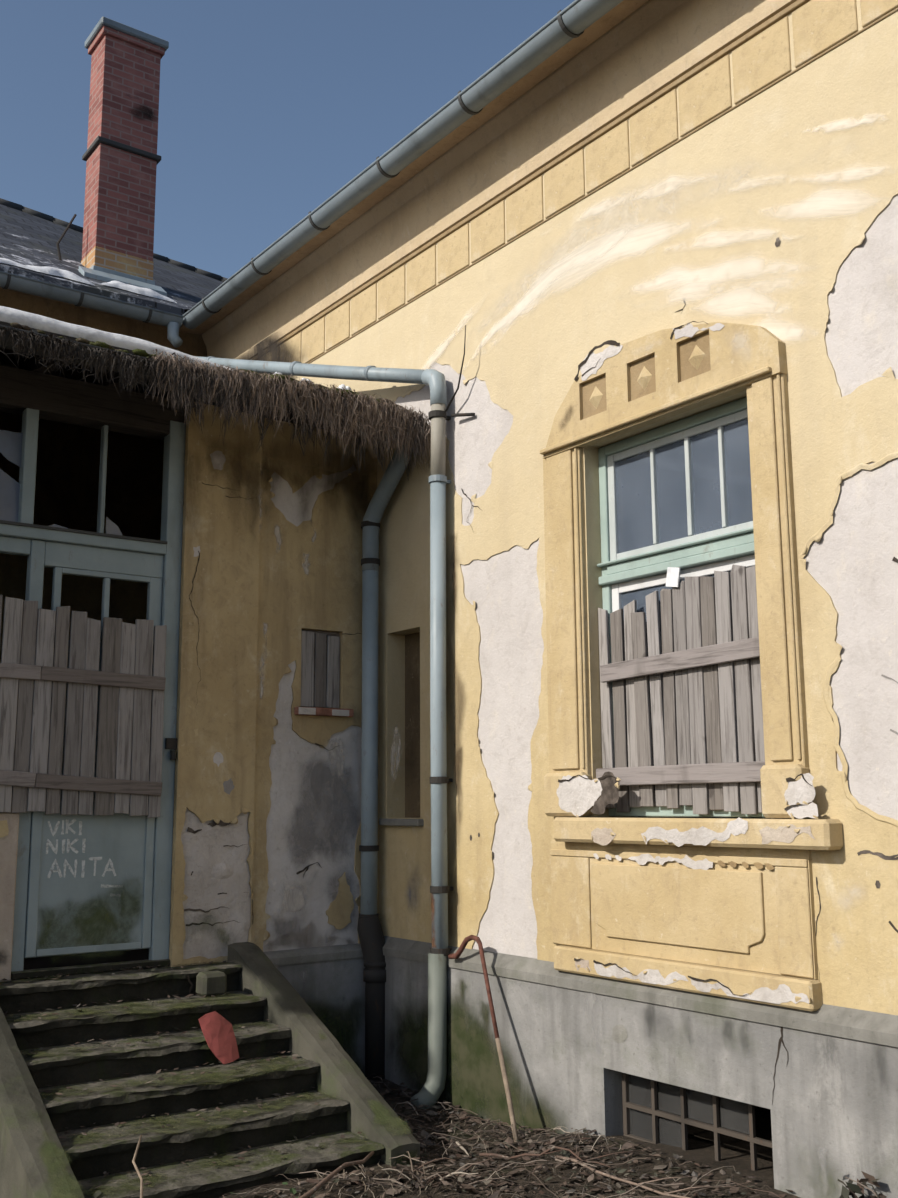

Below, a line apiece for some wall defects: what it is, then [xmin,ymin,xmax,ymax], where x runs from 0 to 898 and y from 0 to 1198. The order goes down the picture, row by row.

flaking render [824,195,898,397]
flaking render [395,385,431,426]
flaking render [430,362,513,526]
flaking render [574,340,623,381]
flaking render [798,458,898,821]
flaking render [181,661,362,959]
water stain [291,740,359,858]
flaking render [461,539,544,959]
flaking render [556,771,819,870]
crack [857,850,898,860]
flaking render [574,958,811,1004]
crack [772,1027,788,1103]